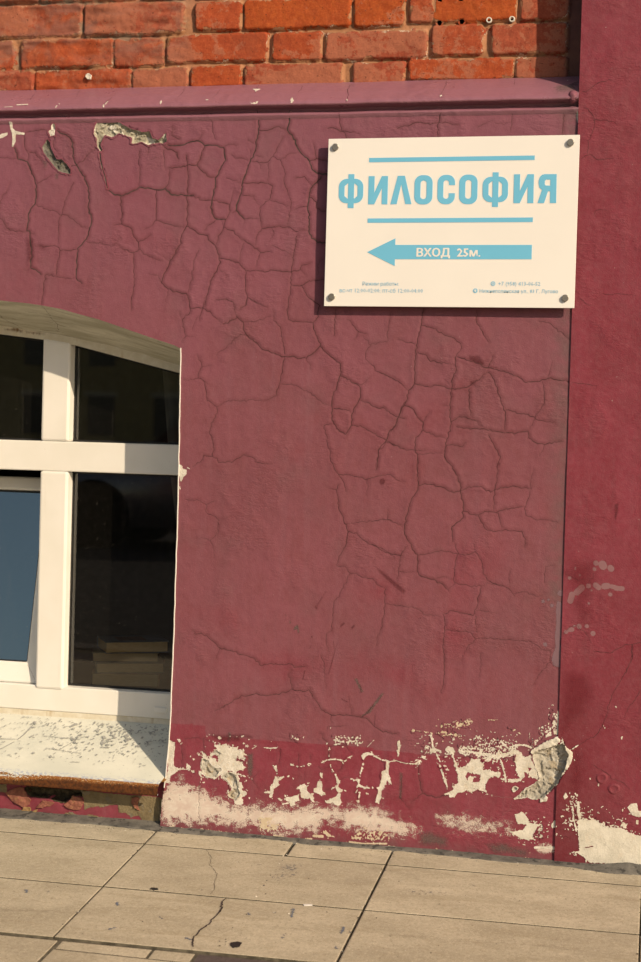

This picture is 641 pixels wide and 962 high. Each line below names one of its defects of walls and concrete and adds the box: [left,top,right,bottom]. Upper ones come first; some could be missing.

peeling [0,122,25,147]
flaking render [40,122,72,176]
flaking render [93,121,168,190]
crack [0,79,641,790]
peeling [0,716,286,837]
flaking render [264,705,641,864]
crack [191,851,226,947]